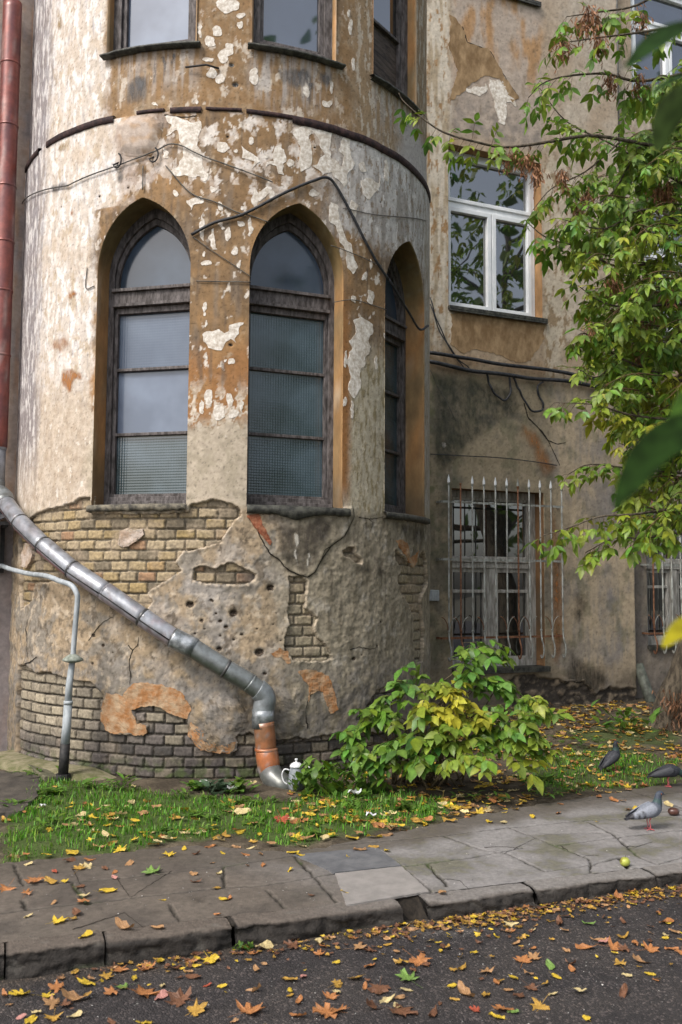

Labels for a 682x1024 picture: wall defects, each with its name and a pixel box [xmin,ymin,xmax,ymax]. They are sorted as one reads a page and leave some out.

flaking render [22,538,74,606]
flaking render [31,496,272,608]